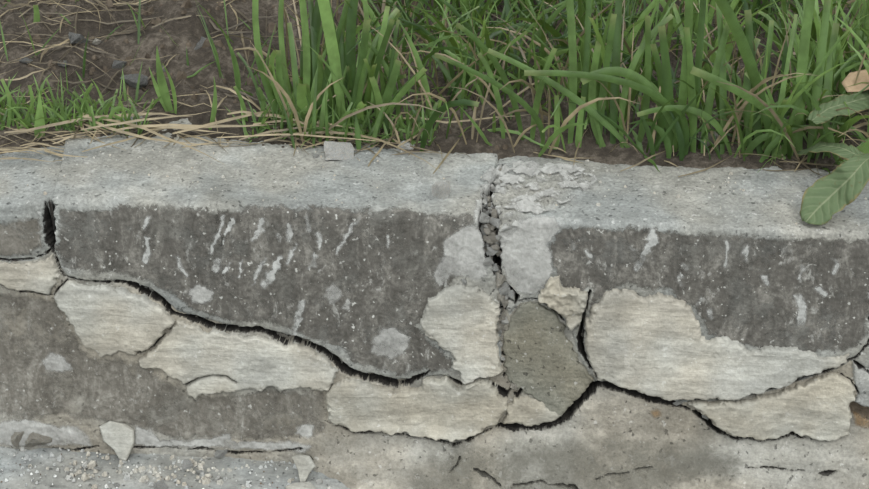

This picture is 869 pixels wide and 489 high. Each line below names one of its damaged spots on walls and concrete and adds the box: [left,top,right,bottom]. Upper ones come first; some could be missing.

crack [0,248,51,262]
water stain [0,295,324,440]
crack [95,279,430,388]
peeling [0,160,856,442]
crack [395,164,812,489]
crack [795,317,869,392]
crack [748,466,836,476]